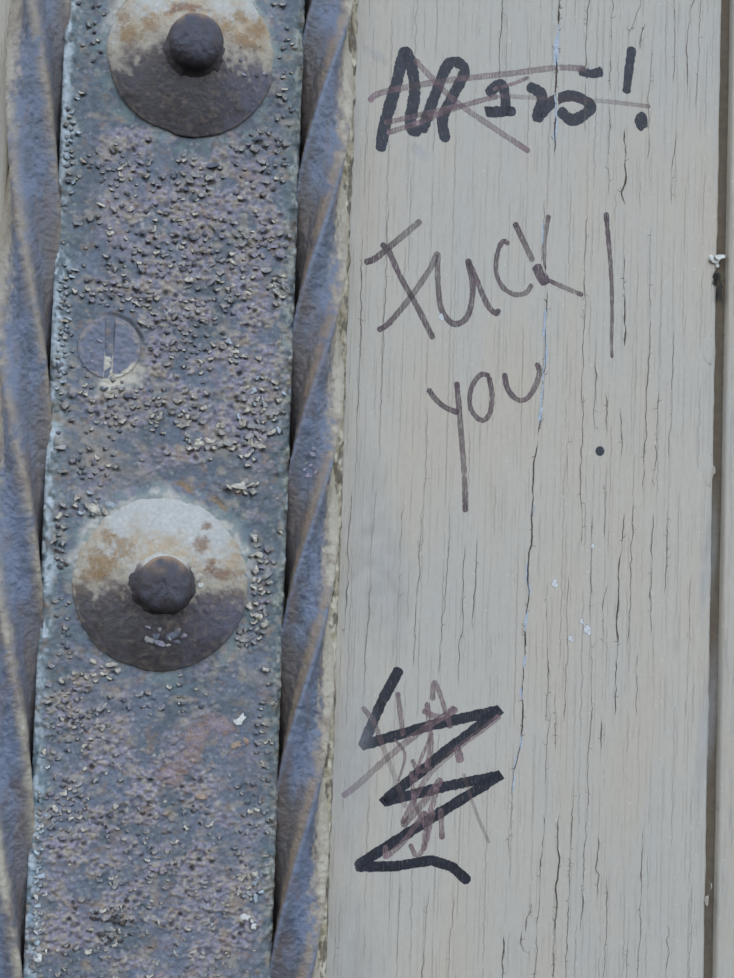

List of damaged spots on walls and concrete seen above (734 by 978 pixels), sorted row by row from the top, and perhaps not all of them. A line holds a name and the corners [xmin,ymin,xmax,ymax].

crack [498,0,506,82]
crack [551,0,701,203]
crack [357,213,389,459]
crack [341,488,376,684]
crack [397,509,421,664]
crack [439,523,477,681]
crack [501,212,674,978]
crack [397,882,429,978]
crack [665,881,712,977]